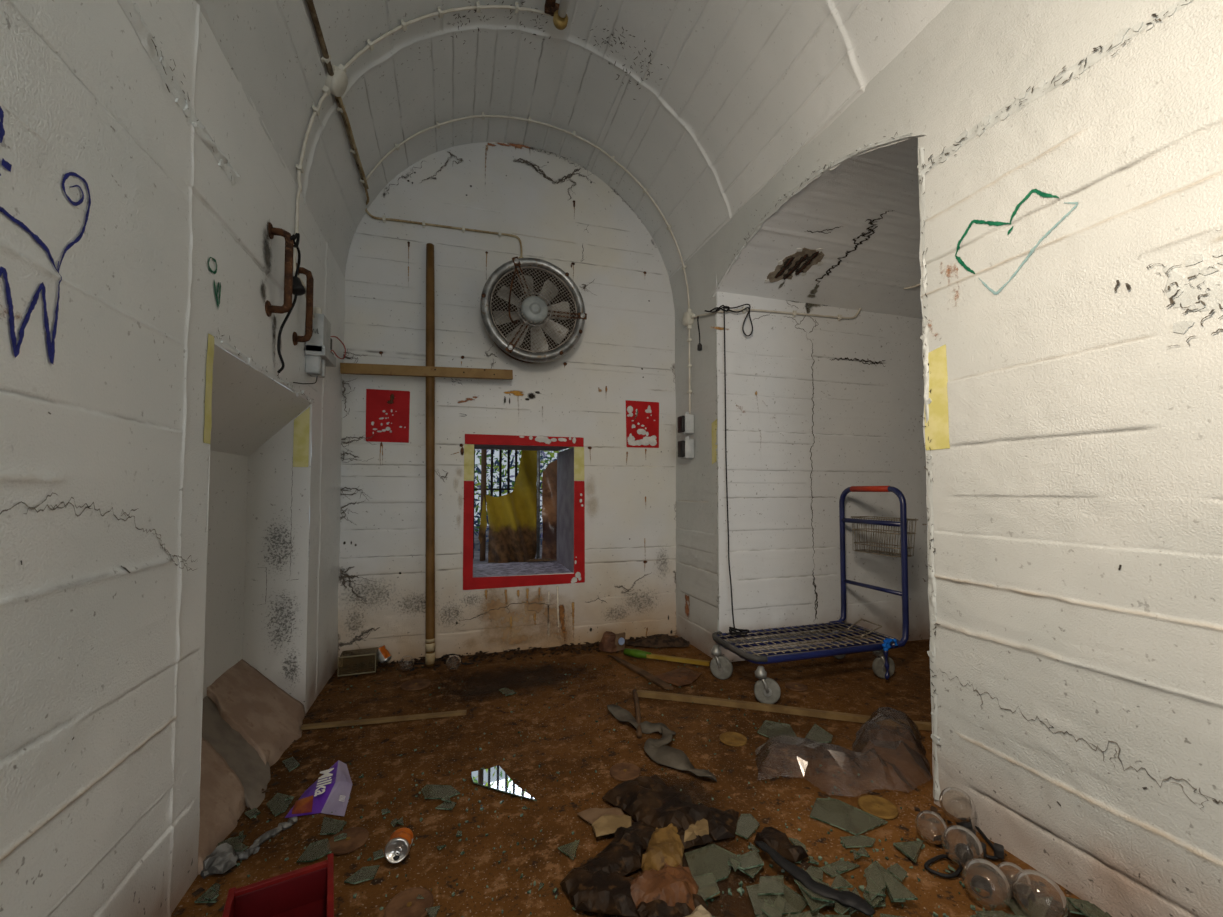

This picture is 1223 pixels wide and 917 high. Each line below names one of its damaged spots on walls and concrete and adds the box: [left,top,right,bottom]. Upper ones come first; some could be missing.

peeling [1146,247,1223,347]
crack [755,210,895,619]
spalling [917,0,1194,800]
crack [0,492,196,571]
mould [266,595,299,681]
damp [441,586,574,645]
crack [936,670,1223,813]